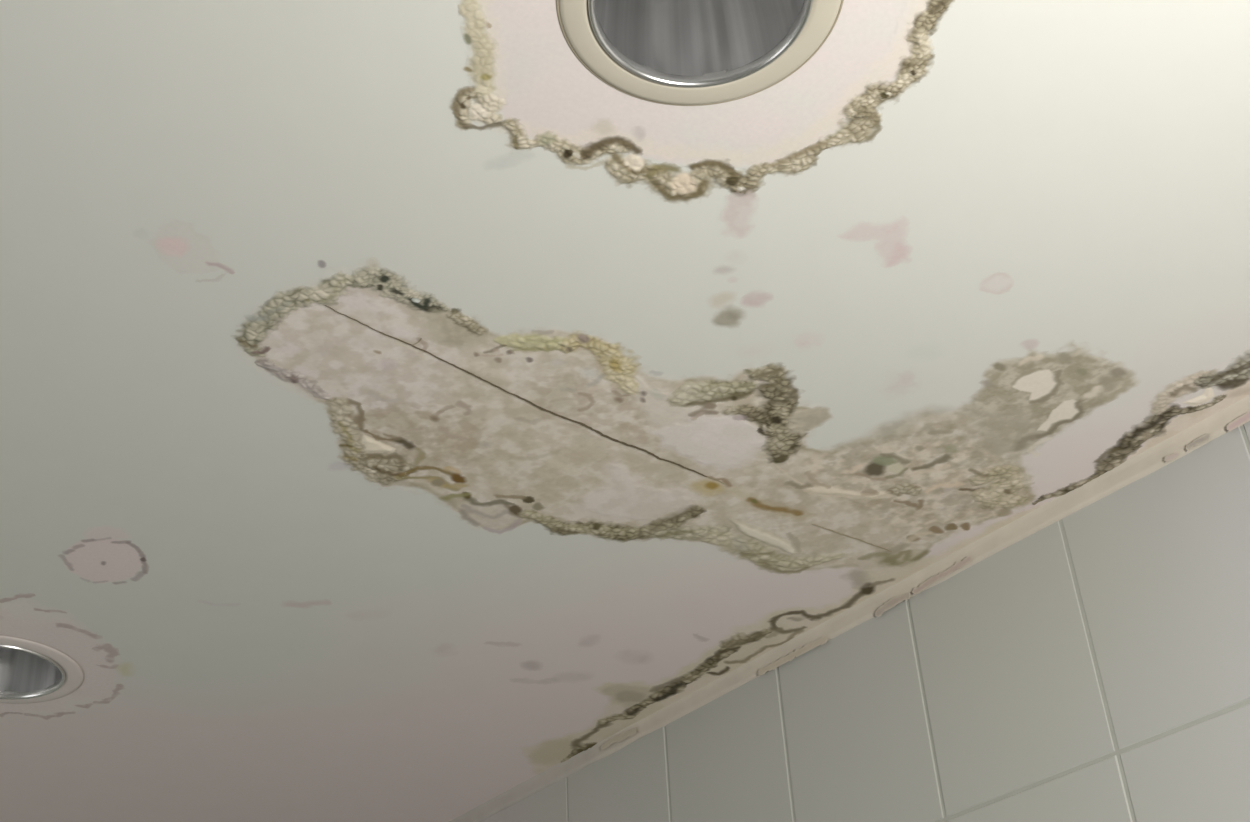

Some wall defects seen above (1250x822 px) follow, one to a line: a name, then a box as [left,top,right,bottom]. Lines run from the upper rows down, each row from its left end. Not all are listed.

crack [325,305,724,484]
peeling [230,256,1042,577]
crack [812,524,892,552]